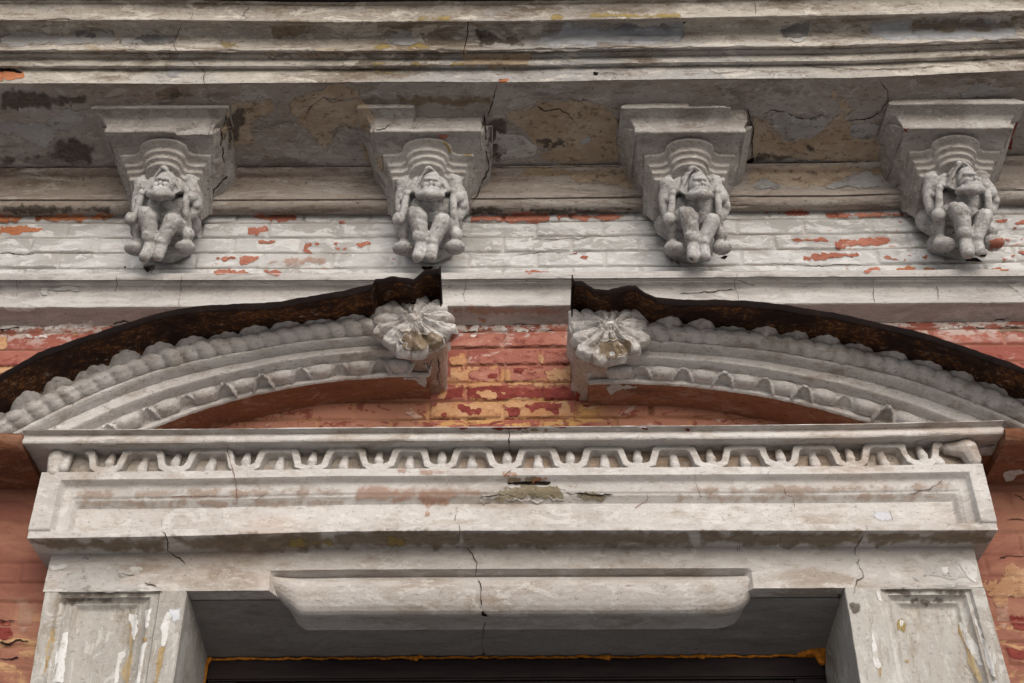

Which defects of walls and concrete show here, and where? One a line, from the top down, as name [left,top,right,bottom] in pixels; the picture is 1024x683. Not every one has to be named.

damp [1,90,86,110]
damp [5,138,95,164]
crack [166,12,336,194]
crack [470,79,620,205]
crack [747,59,1005,164]
peeling [214,213,297,275]
peeling [790,237,935,273]
peeling [395,328,590,436]
crack [153,445,264,564]
spalling [475,476,613,505]
crack [455,515,488,655]
peeling [114,608,181,683]